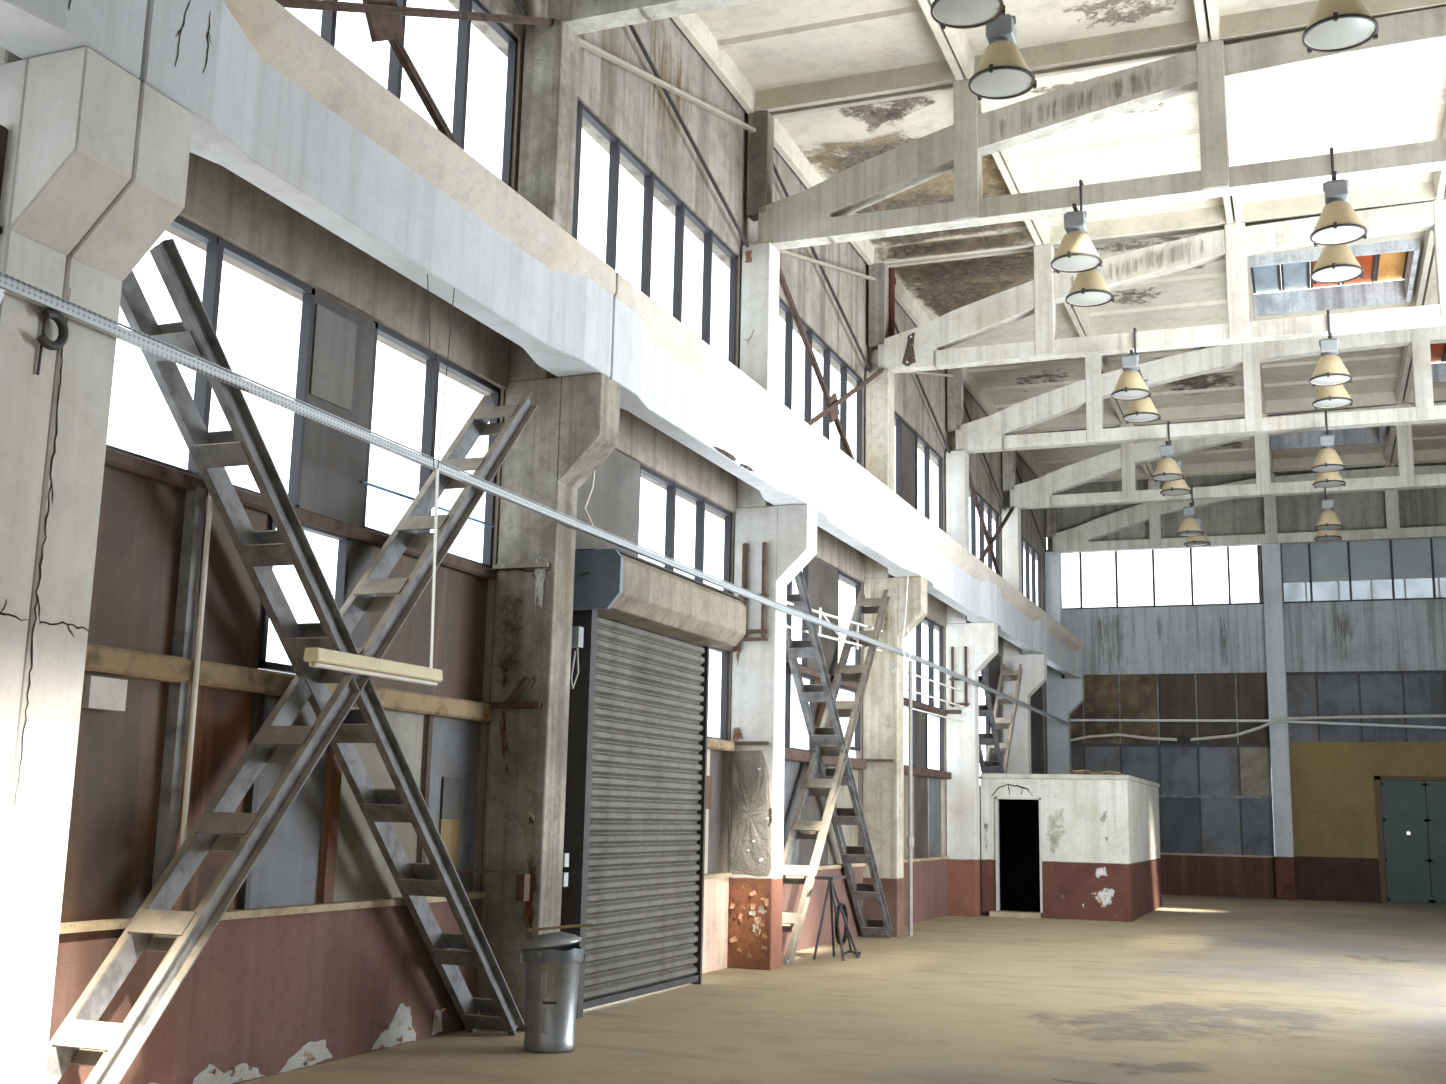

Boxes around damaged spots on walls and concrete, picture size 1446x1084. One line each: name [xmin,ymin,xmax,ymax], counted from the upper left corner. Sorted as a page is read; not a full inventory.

crack [175,0,212,73]
water stain [1064,0,1176,29]
water stain [804,96,935,177]
water stain [855,169,954,214]
water stain [982,155,1011,198]
crack [0,288,89,827]
flaking render [728,750,775,963]
peeling [1082,867,1115,908]
peeling [371,1003,446,1050]
peeling [193,1039,333,1084]